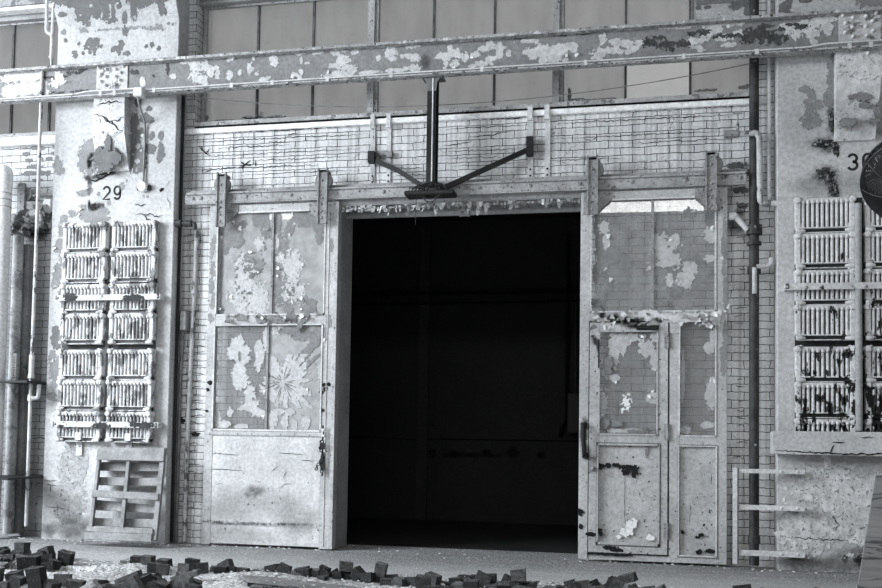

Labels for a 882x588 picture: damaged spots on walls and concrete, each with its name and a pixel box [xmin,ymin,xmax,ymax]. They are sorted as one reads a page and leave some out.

peeling [41,0,176,59]
peeling [778,0,838,45]
peeling [0,71,66,98]
peeling [180,55,280,85]
peeling [291,45,423,79]
peeling [434,32,644,70]
crack [95,100,123,131]
peeling [726,160,749,176]
peeling [733,186,749,209]
peeling [205,211,334,430]
peeling [589,206,730,434]
spalling [599,463,639,478]